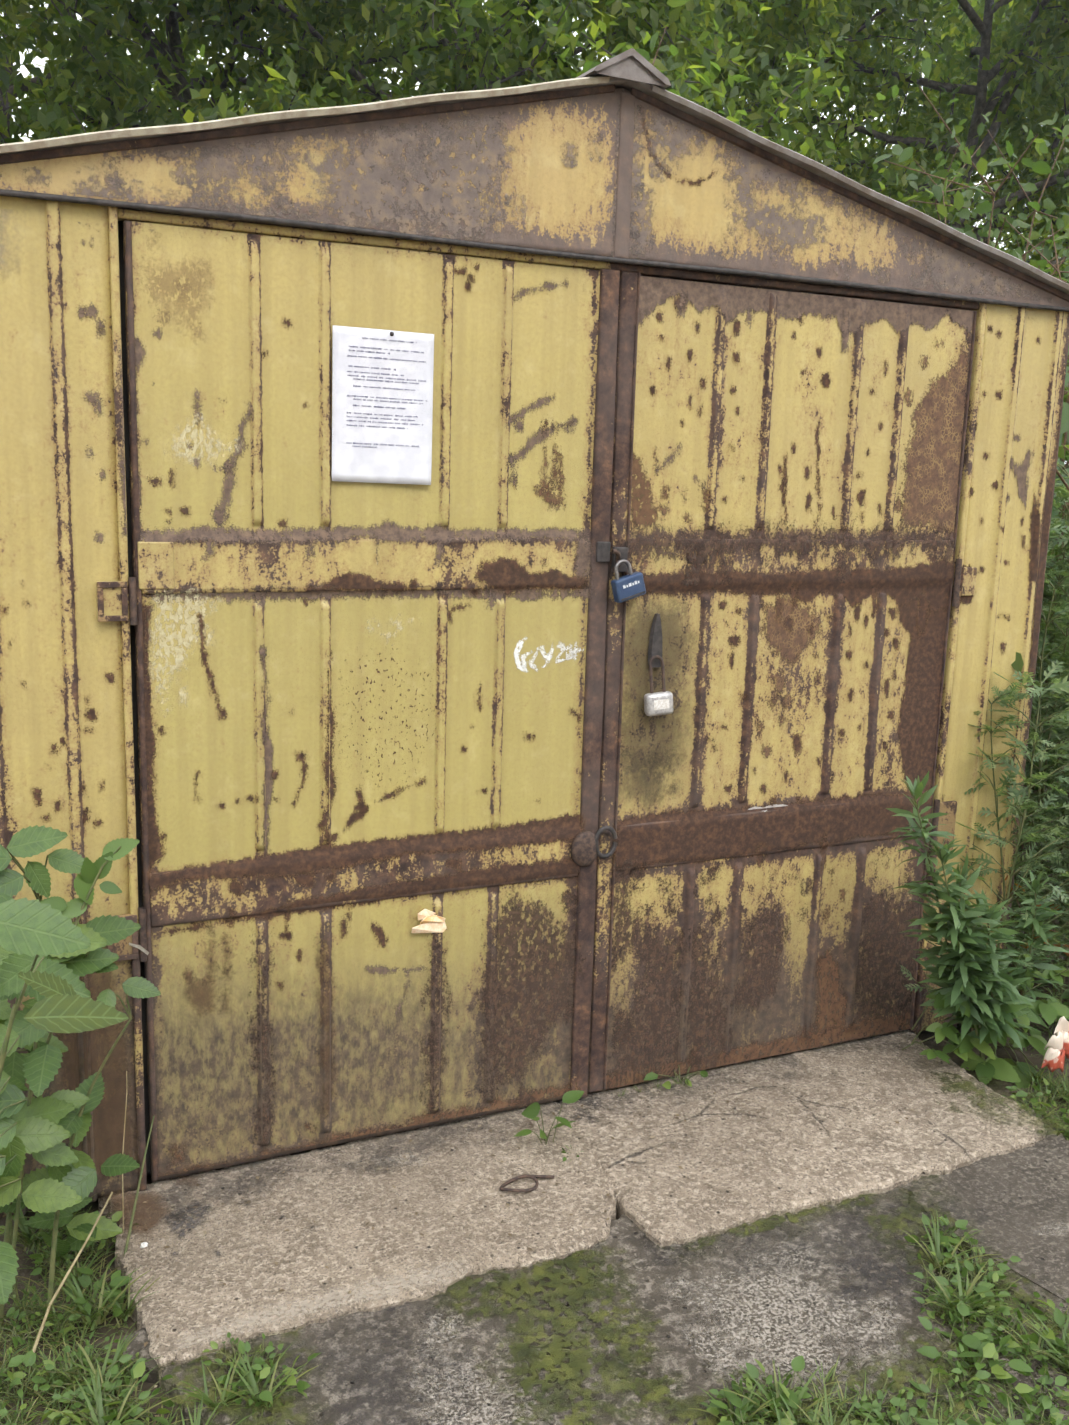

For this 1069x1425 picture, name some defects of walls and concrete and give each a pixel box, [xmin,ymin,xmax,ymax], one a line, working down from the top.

corrosion [78,304,106,336]
corrosion [999,352,1065,695]
corrosion [33,787,60,821]
corrosion [79,781,105,828]
corrosion [84,327,593,1181]
corrosion [602,238,1053,1090]
corrosion [59,972,138,1173]